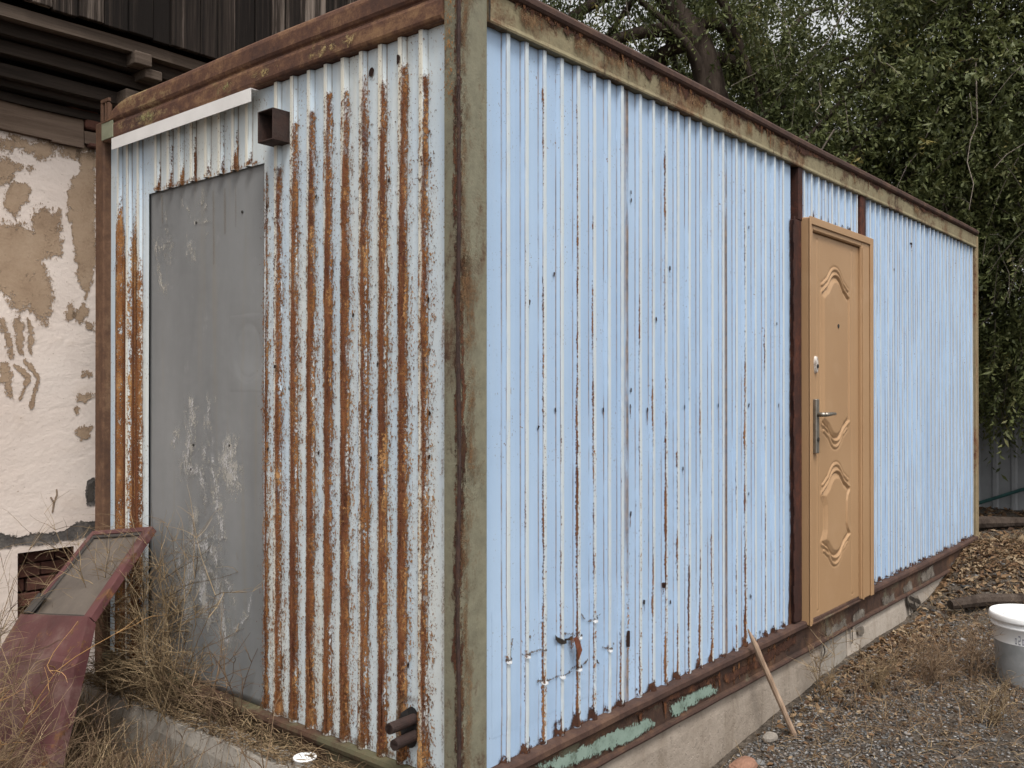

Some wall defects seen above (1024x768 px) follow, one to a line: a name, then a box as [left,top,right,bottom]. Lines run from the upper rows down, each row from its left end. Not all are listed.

corrosion [515,3,944,221]
peeling [0,132,96,399]
peeling [73,392,95,442]
corrosion [115,199,144,529]
corrosion [115,556,144,661]
corrosion [153,0,479,768]
peeling [536,718,655,768]
corrosion [498,221,796,765]
peeling [671,684,718,717]
corrosion [874,535,974,585]